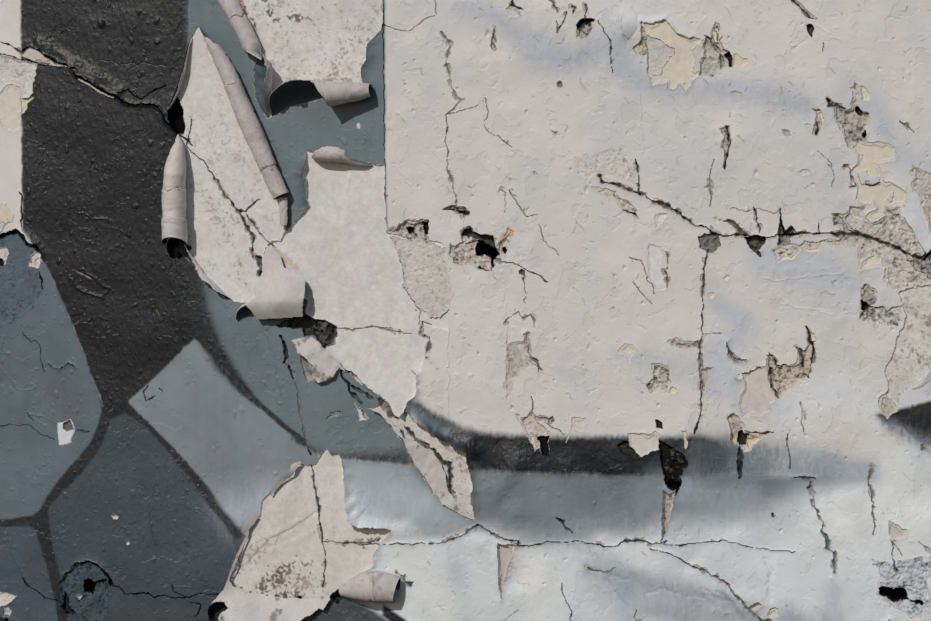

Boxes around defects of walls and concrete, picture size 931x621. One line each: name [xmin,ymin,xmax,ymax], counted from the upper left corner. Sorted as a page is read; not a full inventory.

spalling [0,55,37,133]
crack [0,42,276,278]
peeling [161,0,548,621]
crack [385,185,397,235]
crack [383,0,512,209]
peeling [633,19,749,92]
crack [597,159,931,435]
spalling [744,82,931,419]
spalling [727,326,818,479]
peeling [0,592,17,621]
crack [311,471,796,621]
spalling [872,522,931,619]